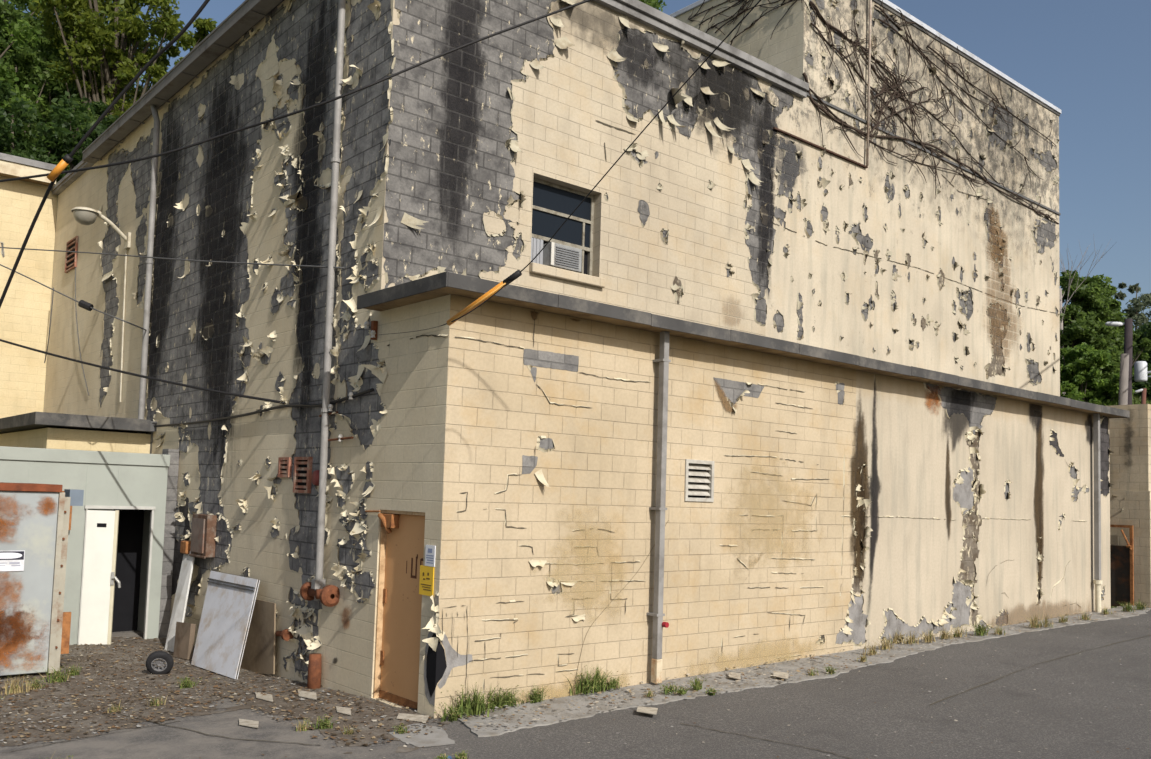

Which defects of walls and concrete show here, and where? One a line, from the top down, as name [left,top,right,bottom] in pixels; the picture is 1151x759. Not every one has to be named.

damp [445,61,476,117]
damp [197,98,243,357]
peeling [607,0,1060,386]
peeling [98,0,579,681]
rust [0,498,17,538]
rust [39,497,55,515]
crack [456,473,645,617]
peeling [816,381,1009,647]
damp [1035,420,1043,576]
rust [0,574,40,667]
spalling [422,591,474,706]
crack [442,600,578,702]